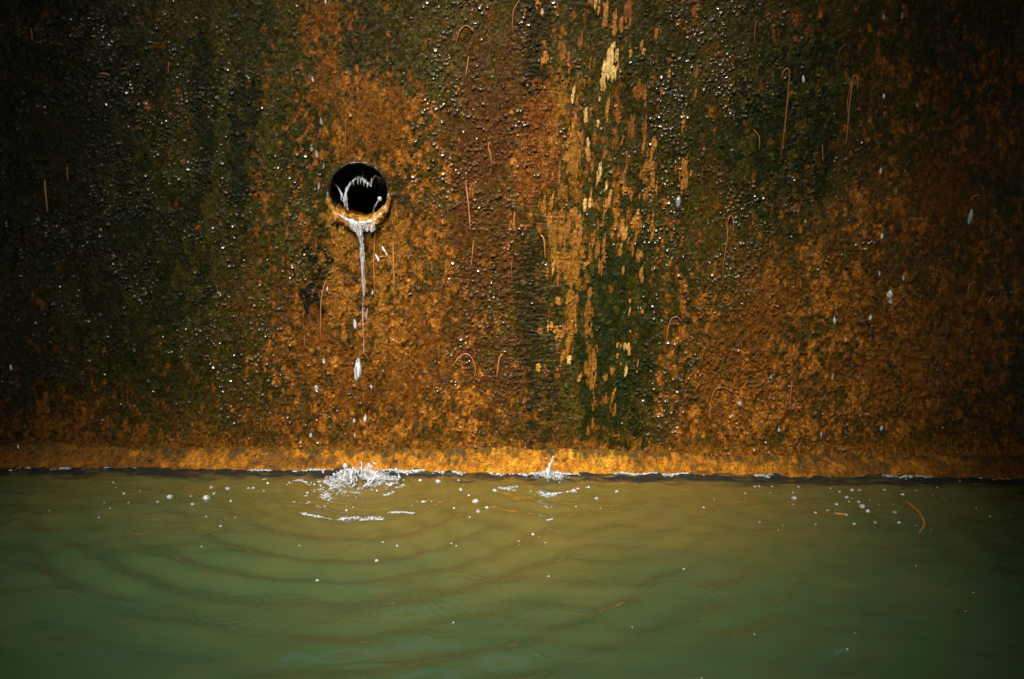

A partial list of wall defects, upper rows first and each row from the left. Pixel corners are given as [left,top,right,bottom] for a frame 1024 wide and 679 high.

water stain [187,24,260,235]
corrosion [300,0,346,131]
corrosion [282,204,457,427]
corrosion [512,56,595,399]
water stain [579,319,654,446]
corrosion [642,124,651,191]
corrosion [678,254,795,442]